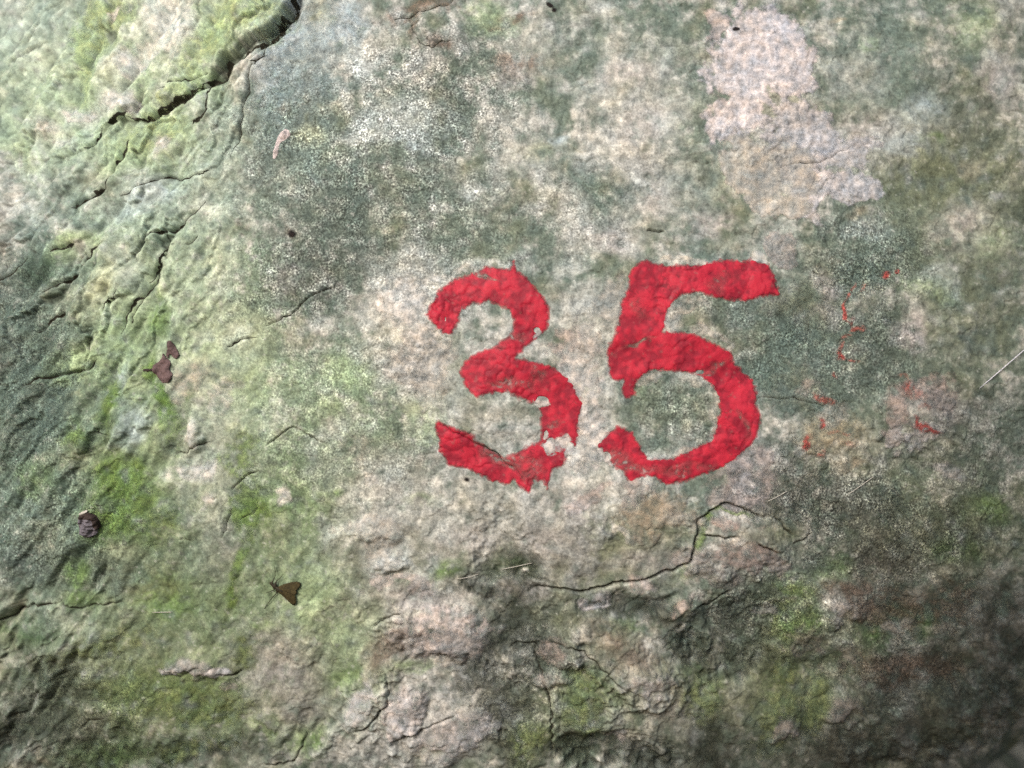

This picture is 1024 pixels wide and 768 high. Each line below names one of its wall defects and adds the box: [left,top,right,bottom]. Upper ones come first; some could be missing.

crack [71,0,300,209]
spalling [794,404,847,455]
spalling [883,375,957,455]
crack [528,502,809,591]